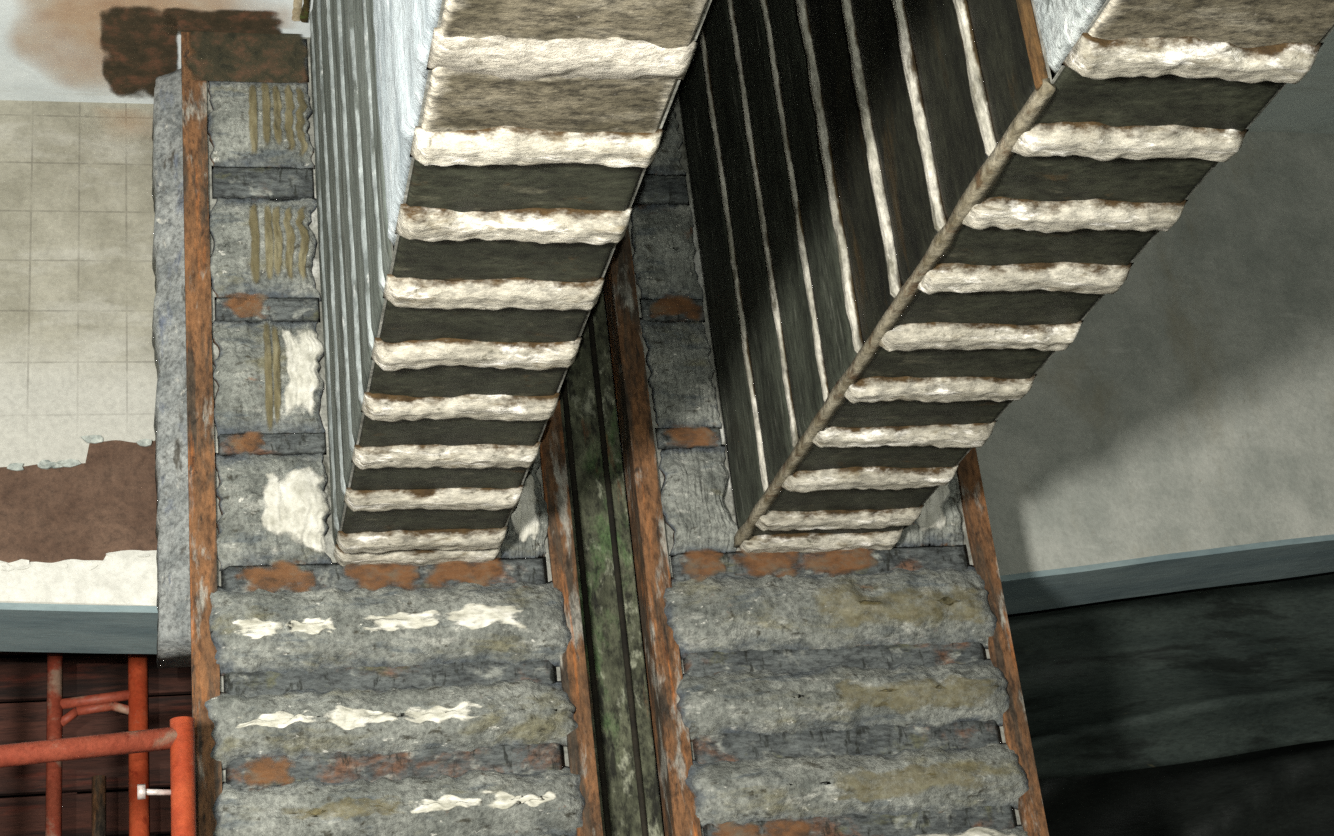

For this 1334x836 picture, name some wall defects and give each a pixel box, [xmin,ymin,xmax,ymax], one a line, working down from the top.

corrosion [39,0,307,97]
peeling [0,435,158,605]